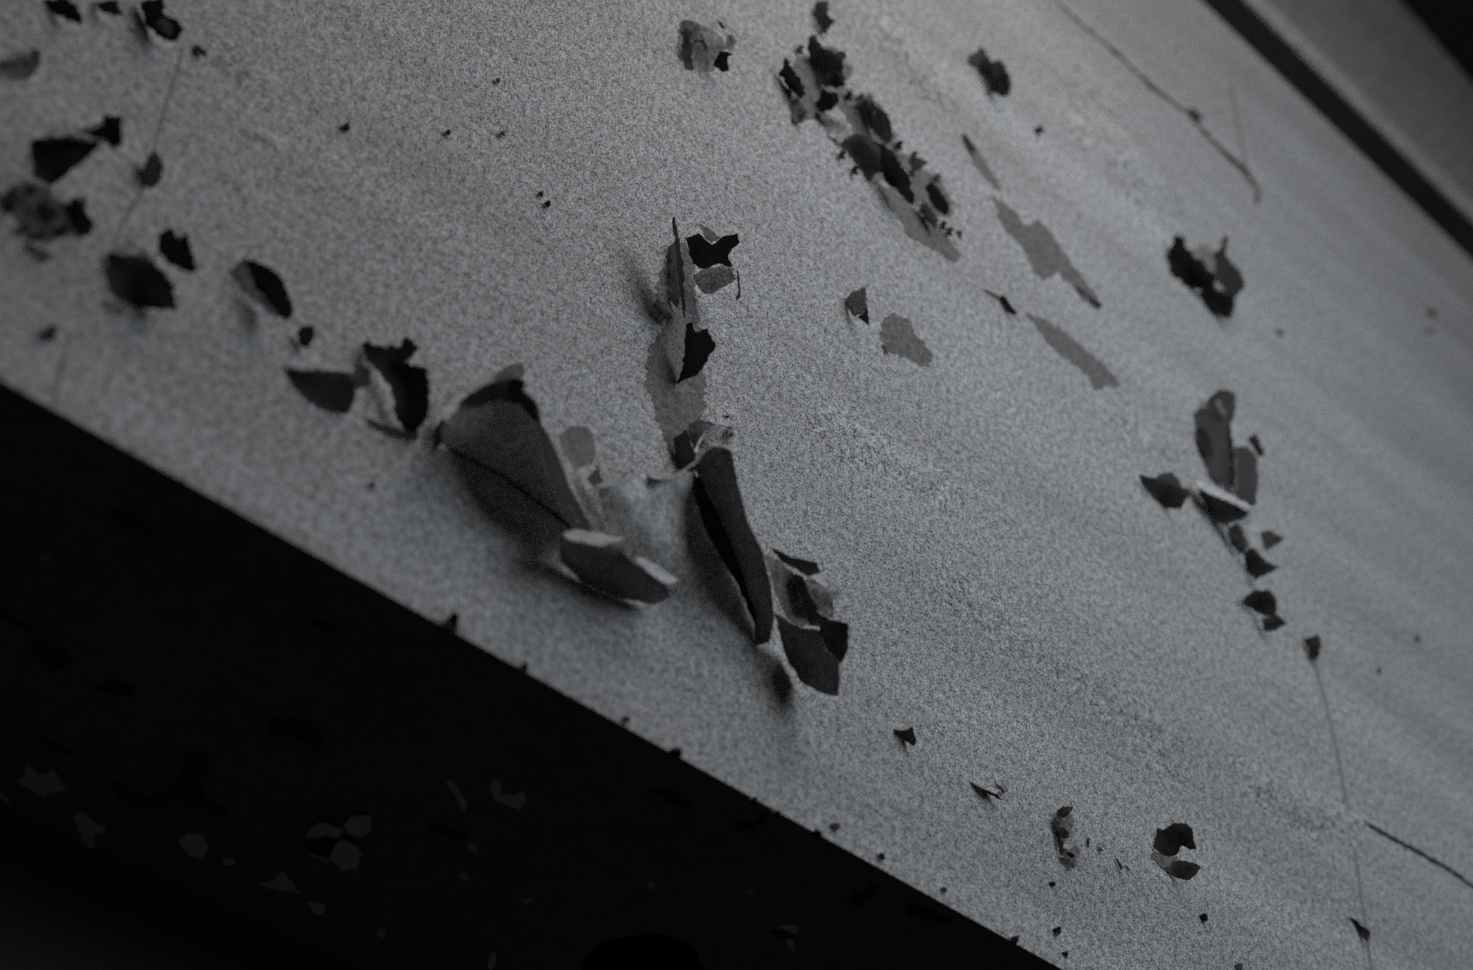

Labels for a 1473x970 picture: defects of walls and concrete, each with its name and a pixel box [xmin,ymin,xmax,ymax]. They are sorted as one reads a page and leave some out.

peeling [0,114,123,261]
peeling [677,20,737,72]
peeling [778,1,963,264]
peeling [969,45,1012,98]
crack [1055,0,1260,204]
peeling [101,227,199,316]
peeling [1165,234,1245,319]
peeling [232,217,849,697]
peeling [1138,389,1287,632]
peeling [1049,806,1130,887]
peeling [1151,823,1201,880]
crack [1312,660,1473,970]